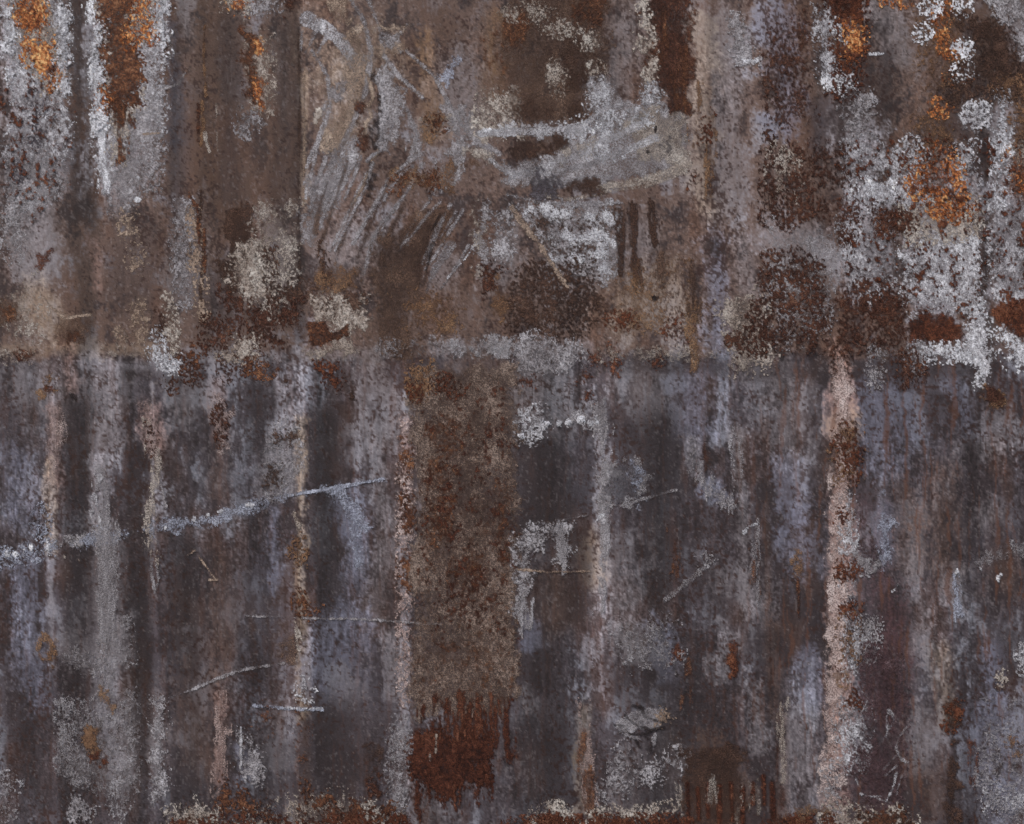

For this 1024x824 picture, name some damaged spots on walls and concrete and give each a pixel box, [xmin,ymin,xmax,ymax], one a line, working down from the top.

rust [0,0,76,223]
rust [91,0,163,168]
rust [236,25,266,111]
rust [420,108,450,144]
rust [478,0,616,202]
rust [636,0,718,199]
rust [723,0,1024,390]
rust [159,158,525,824]
rust [854,801,915,824]